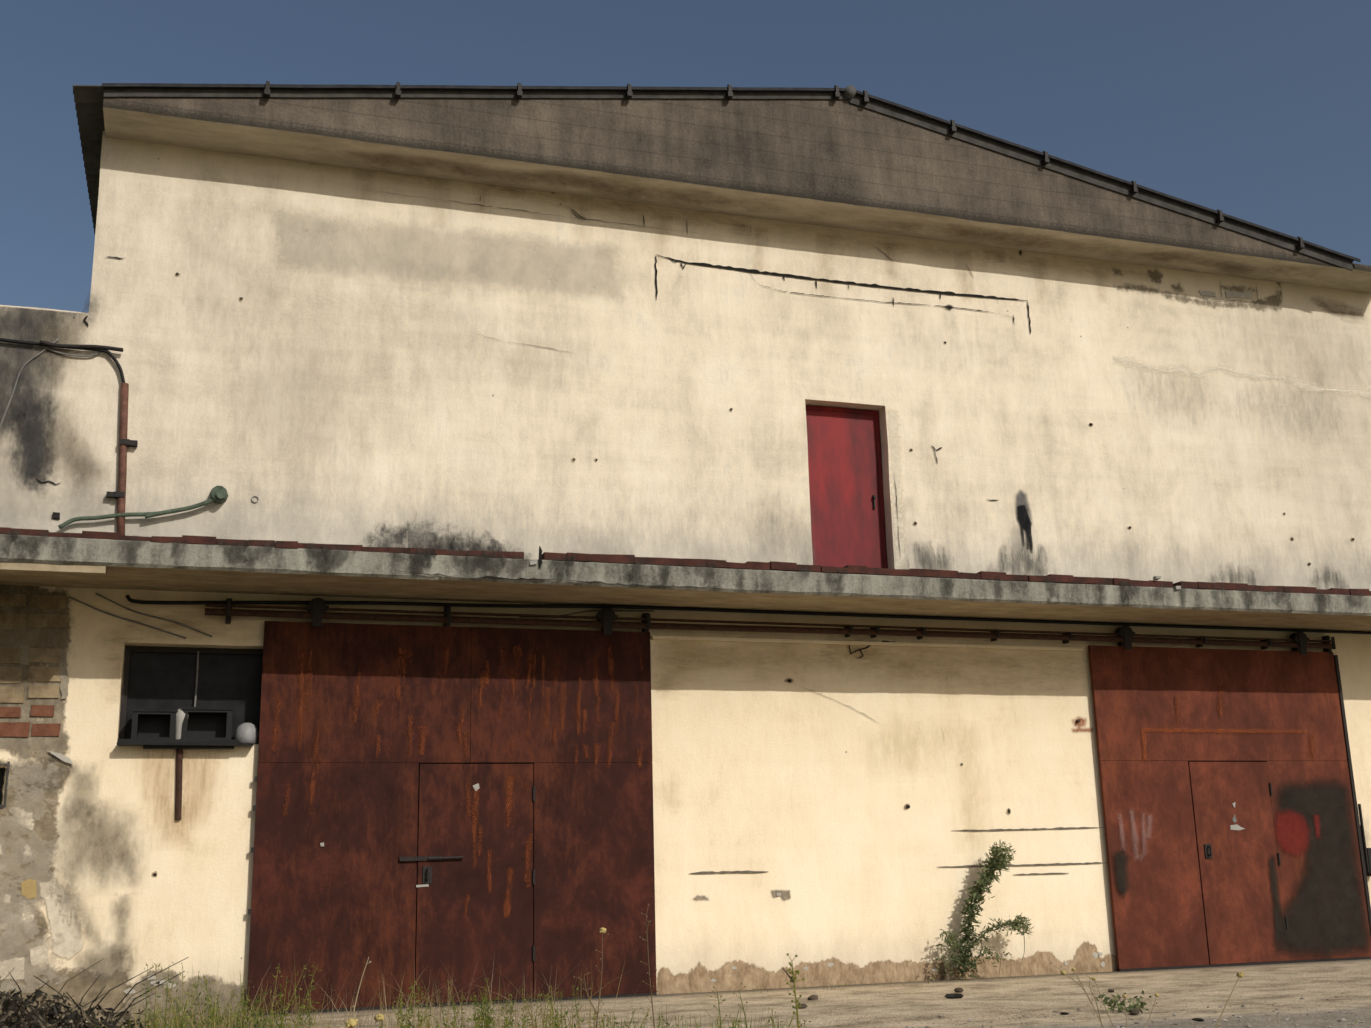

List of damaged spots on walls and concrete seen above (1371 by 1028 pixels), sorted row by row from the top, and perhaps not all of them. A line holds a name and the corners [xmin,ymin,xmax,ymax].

crack [357,189,1031,334]
spalling [1113,269,1282,310]
water stain [0,307,93,479]
water stain [369,524,528,575]
peeling [0,585,247,1024]
rust [466,776,530,917]
water stain [84,950,123,981]
peeling [657,942,1117,994]